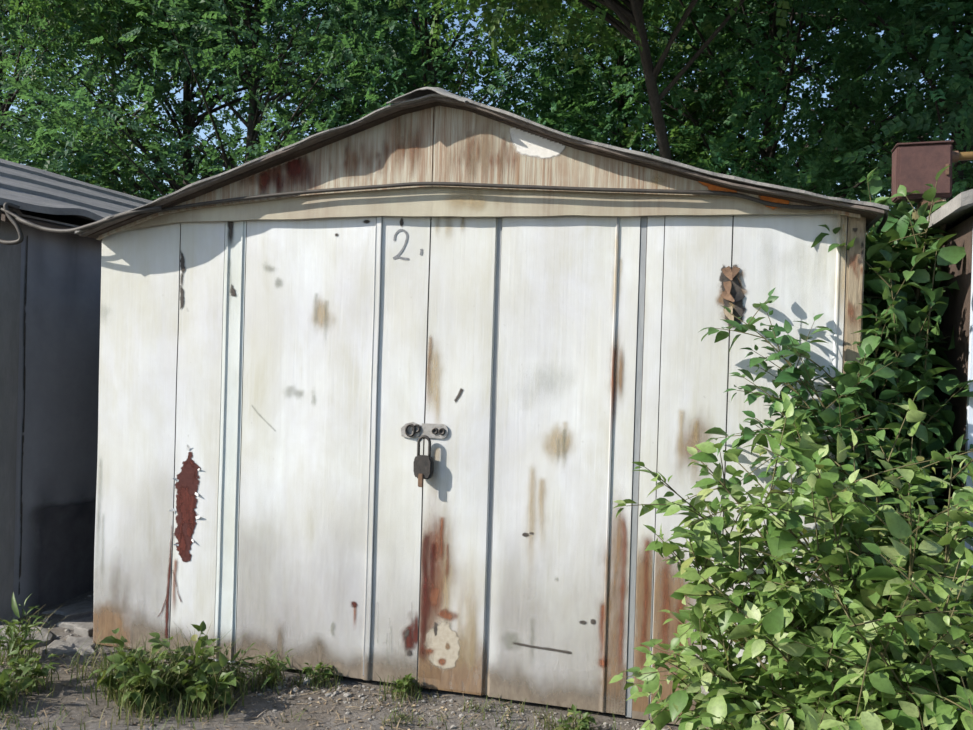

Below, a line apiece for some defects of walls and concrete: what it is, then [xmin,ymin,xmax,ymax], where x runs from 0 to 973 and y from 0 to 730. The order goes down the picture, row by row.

peeling [510,127,565,158]
corrosion [250,158,311,193]
peeling [720,266,745,321]
corrosion [612,346,623,412]
corrosion [403,518,487,695]
corrosion [599,516,692,717]
peeling [424,622,460,669]